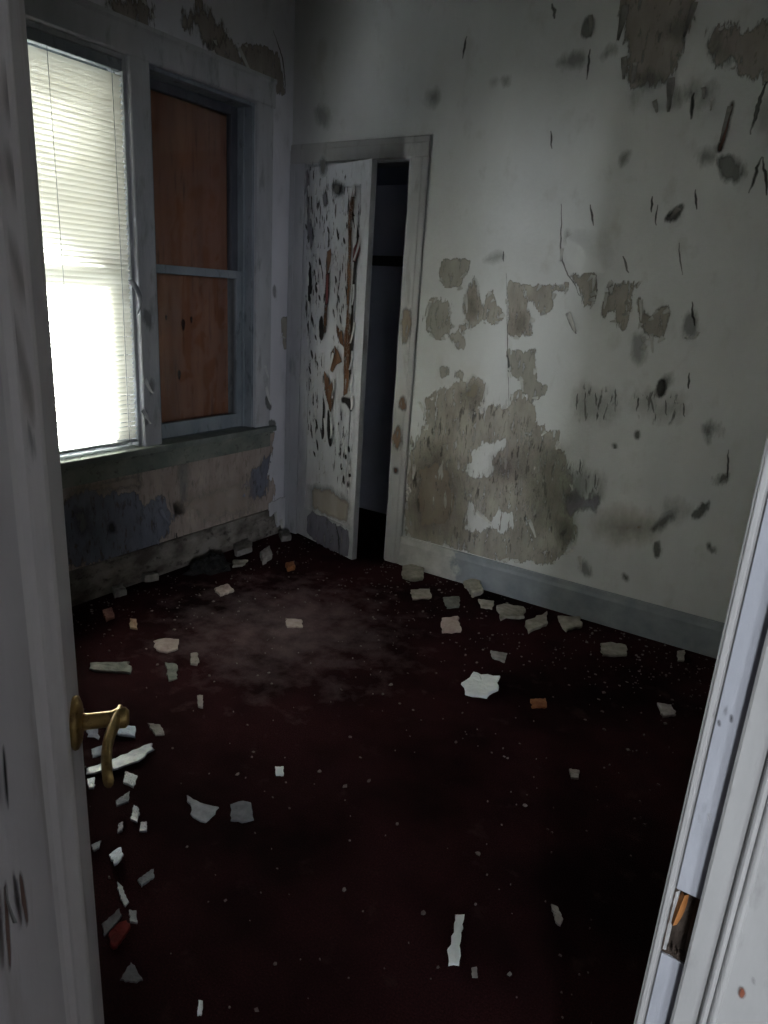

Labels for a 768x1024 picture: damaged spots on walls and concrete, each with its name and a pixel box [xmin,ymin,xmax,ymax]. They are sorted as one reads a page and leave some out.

peeling [181,0,285,96]
peeling [616,0,698,113]
peeling [705,18,768,85]
peeling [304,167,362,496]
peeling [62,365,276,543]
peeling [404,258,671,565]
spalling [636,379,685,419]
flaking render [260,546,272,565]
spalling [661,888,700,963]